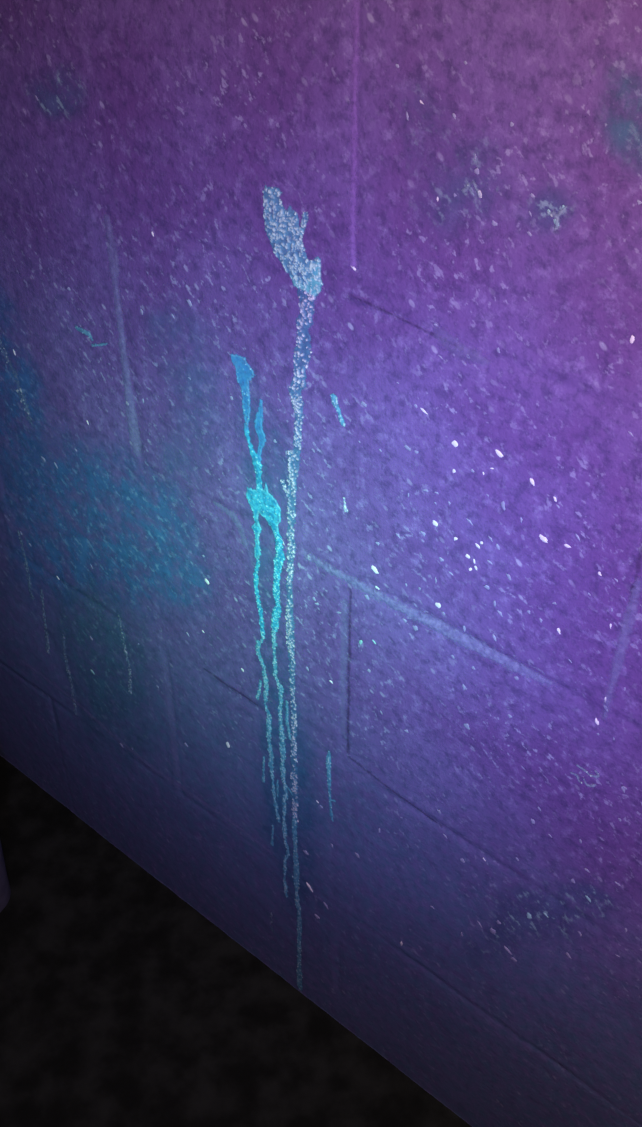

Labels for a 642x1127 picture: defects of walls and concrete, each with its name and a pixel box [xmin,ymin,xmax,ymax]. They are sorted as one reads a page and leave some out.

water stain [230,186,323,991]
water stain [326,751,336,822]